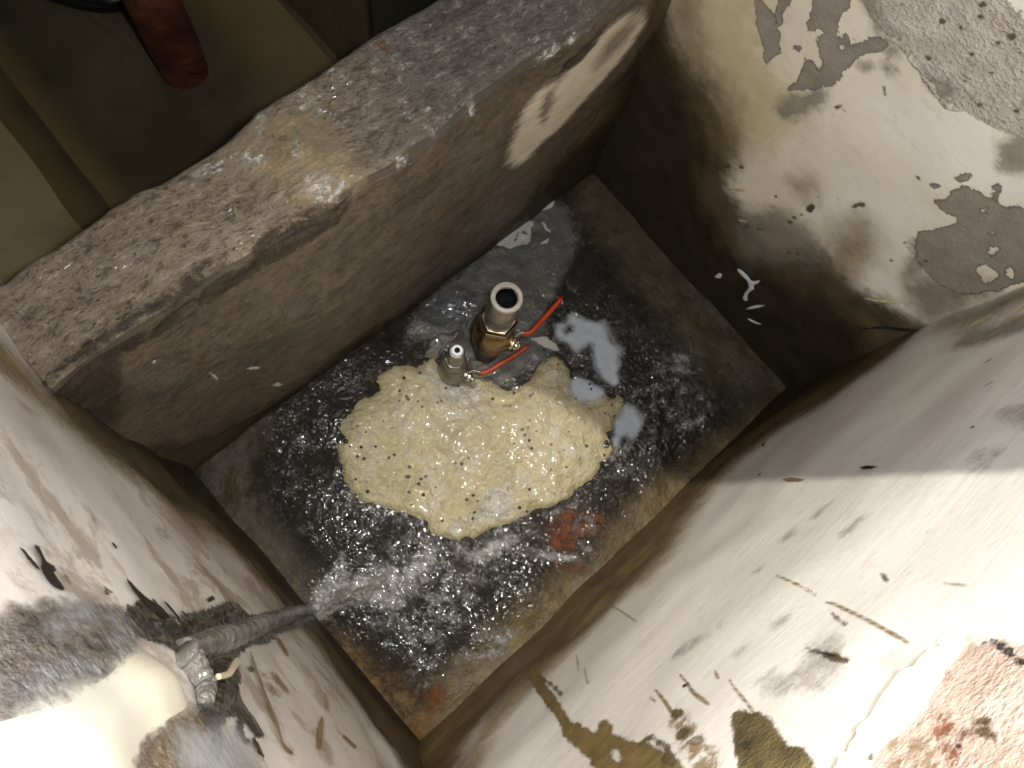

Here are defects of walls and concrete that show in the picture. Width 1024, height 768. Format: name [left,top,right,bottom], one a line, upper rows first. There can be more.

peeling [506,10,646,168]
spalling [755,0,1024,171]
damp [0,0,671,607]
damp [302,0,925,768]
peeling [908,173,1024,346]
spalling [20,545,71,590]
corrosion [534,510,604,572]
spalling [867,639,1024,768]